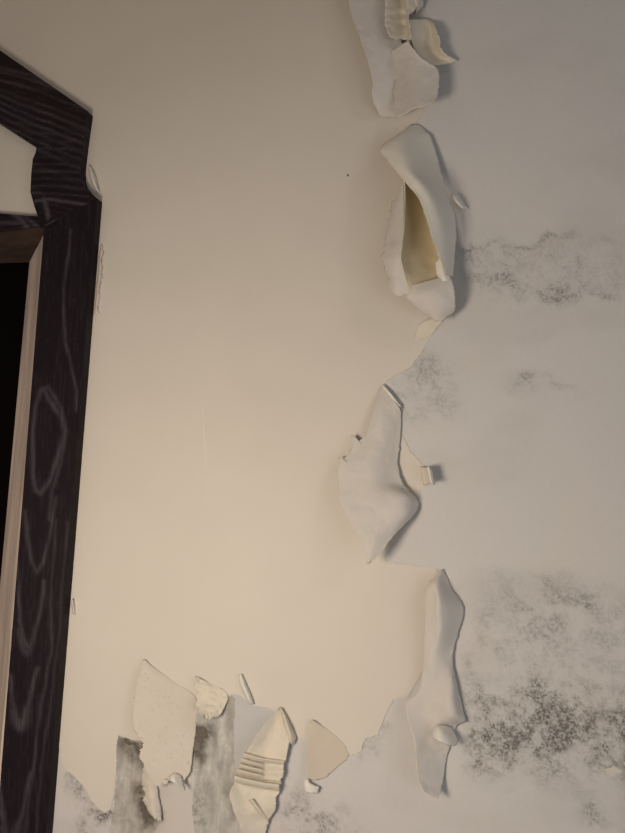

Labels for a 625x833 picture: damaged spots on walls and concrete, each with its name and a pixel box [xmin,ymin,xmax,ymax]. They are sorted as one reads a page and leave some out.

peeling [265,0,625,833]
damp [117,738,143,757]
peeling [53,659,296,833]
mould [470,684,608,760]
damp [135,785,157,825]